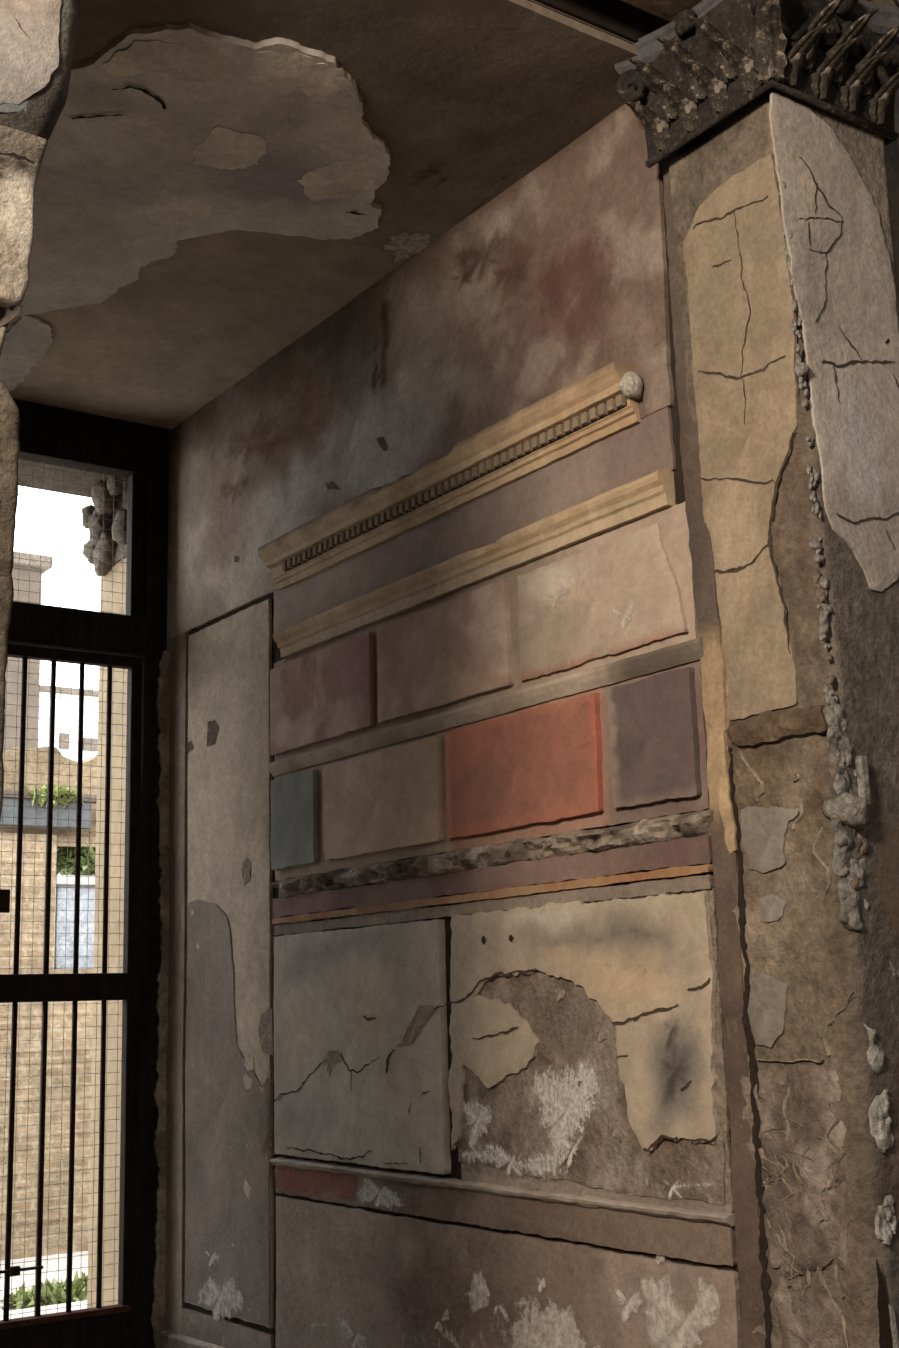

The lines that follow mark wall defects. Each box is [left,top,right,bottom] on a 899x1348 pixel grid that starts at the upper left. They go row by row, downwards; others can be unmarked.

flaking render [0,0,390,391]
crack [693,195,785,424]
crack [799,156,899,404]
crack [700,430,796,652]
crack [836,512,899,549]
flaking render [184,900,273,1327]
crack [272,1050,395,1104]
crack [287,1147,421,1165]
flaking render [458,970,726,1205]
flaking render [747,972,854,1348]
flaking render [868,1089,894,1153]
flaking render [875,1195,897,1245]